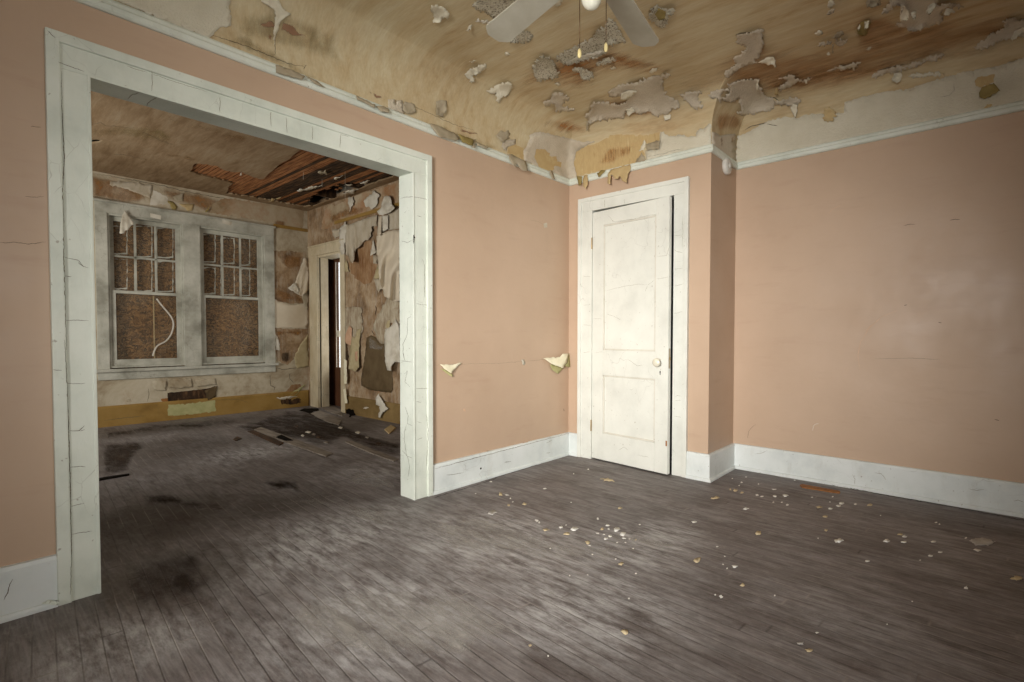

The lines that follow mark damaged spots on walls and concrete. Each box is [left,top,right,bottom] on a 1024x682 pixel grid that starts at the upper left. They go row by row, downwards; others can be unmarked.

peeling [261,0,290,45]
peeling [431,4,450,23]
peeling [466,0,516,32]
peeling [857,0,962,50]
peeling [356,96,416,114]
peeling [430,100,488,149]
peeling [487,82,512,103]
peeling [496,17,1024,189]
flaking render [274,250,306,304]
crack [0,62,248,593]
flaking render [275,328,309,365]
flaking render [161,386,217,402]